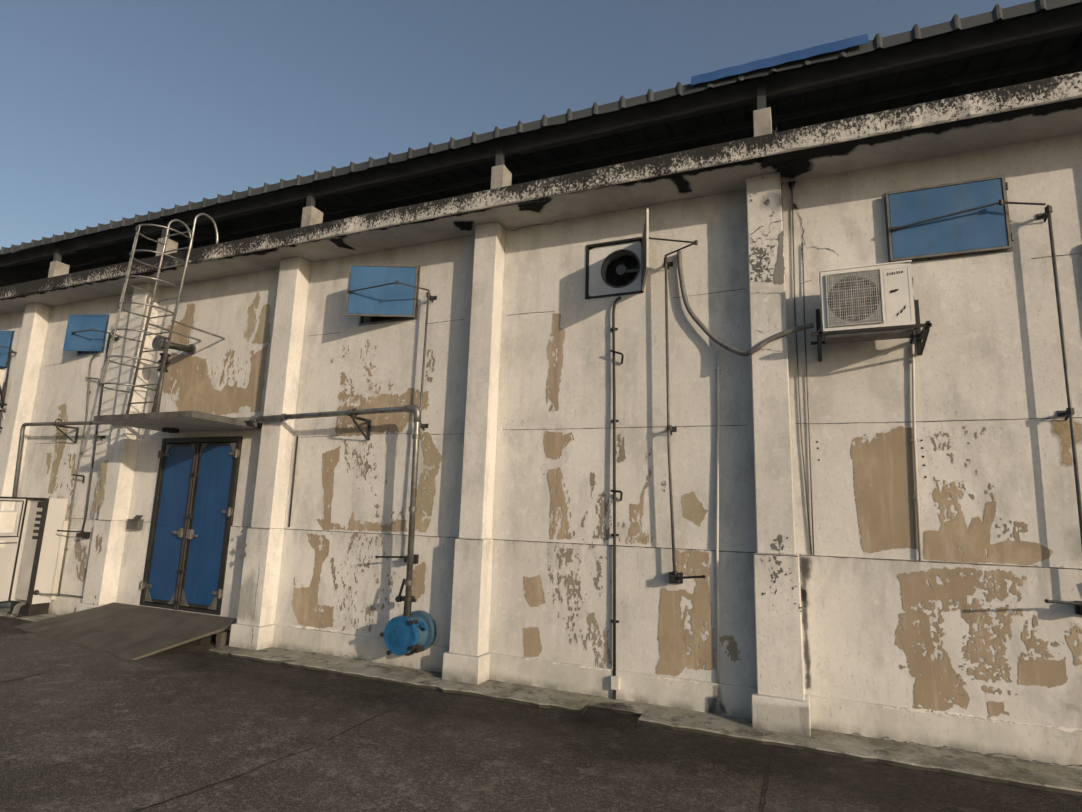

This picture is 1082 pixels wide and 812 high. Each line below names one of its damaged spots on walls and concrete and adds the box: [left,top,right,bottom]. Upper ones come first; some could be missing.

mould [565,98,1082,217]
mould [0,197,551,300]
mould [748,245,775,282]
flaking render [773,231,785,284]
peeling [159,292,270,415]
peeling [546,313,565,412]
peeling [290,339,442,636]
peeling [523,431,653,671]
peeling [644,549,741,684]
leakage [760,532,810,688]
peeling [850,426,1082,733]